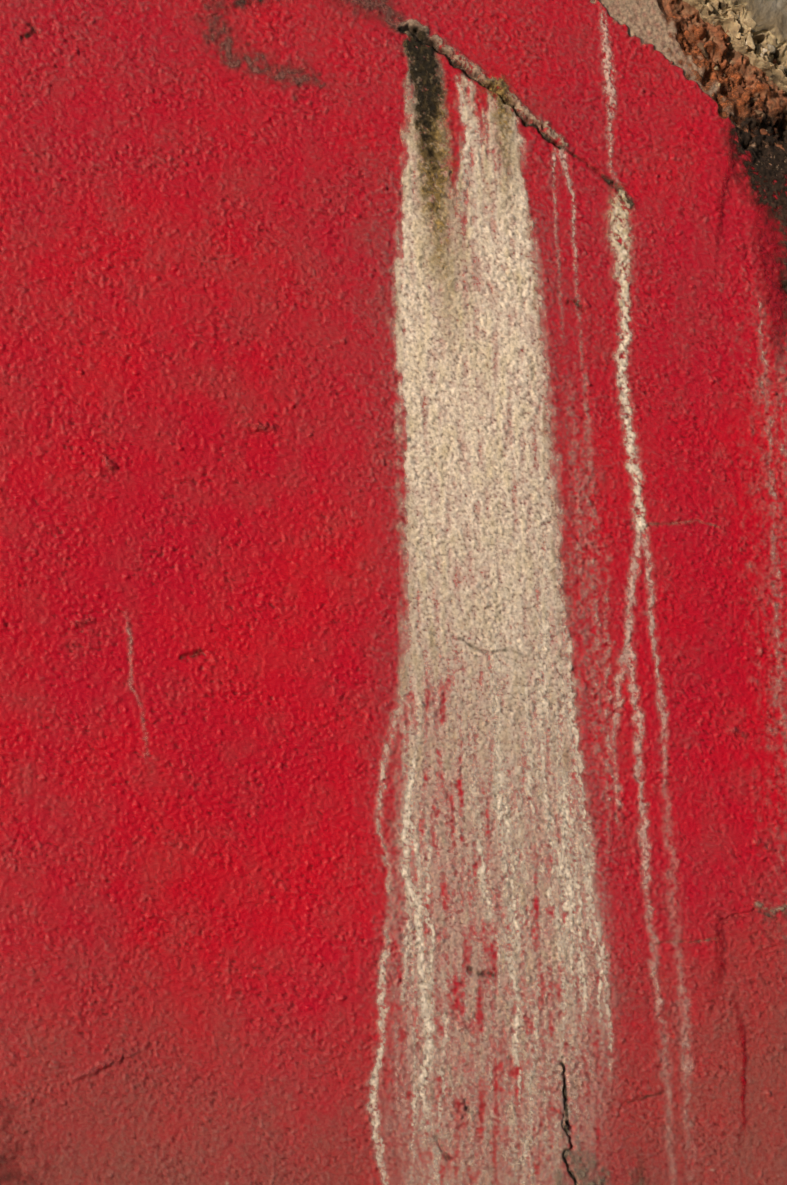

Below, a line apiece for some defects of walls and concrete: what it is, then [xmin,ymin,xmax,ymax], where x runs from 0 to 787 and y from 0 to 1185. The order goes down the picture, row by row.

crack [400,19,576,157]
spalling [590,0,787,176]
corrosion [666,15,770,130]
crack [601,175,634,209]
damp [729,104,787,294]
damp [370,27,611,1185]
crack [561,1056,577,1185]